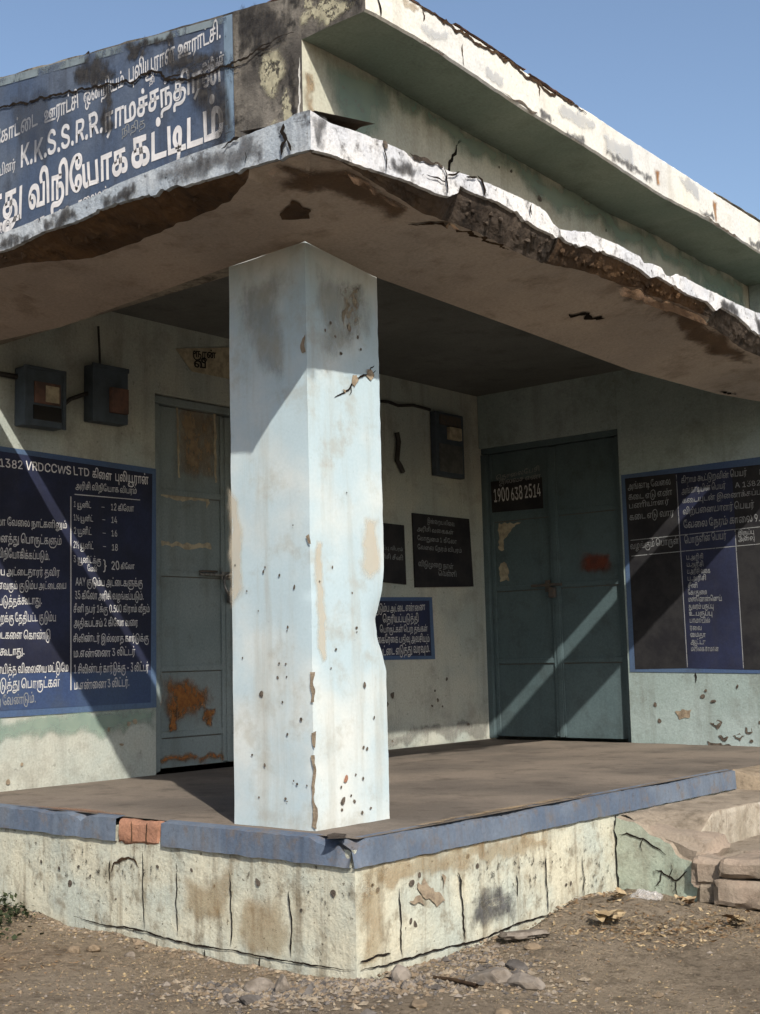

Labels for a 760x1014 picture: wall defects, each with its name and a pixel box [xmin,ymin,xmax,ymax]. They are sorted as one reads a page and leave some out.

crack [0,32,294,108]
water stain [126,32,257,178]
water stain [239,7,327,144]
water stain [280,166,406,218]
spalling [410,153,443,168]
crack [428,141,486,195]
crack [414,0,587,114]
water stain [335,71,744,315]
spalling [442,189,760,356]
flaking render [114,813,166,846]
crack [74,853,549,971]
flaking render [409,872,446,907]